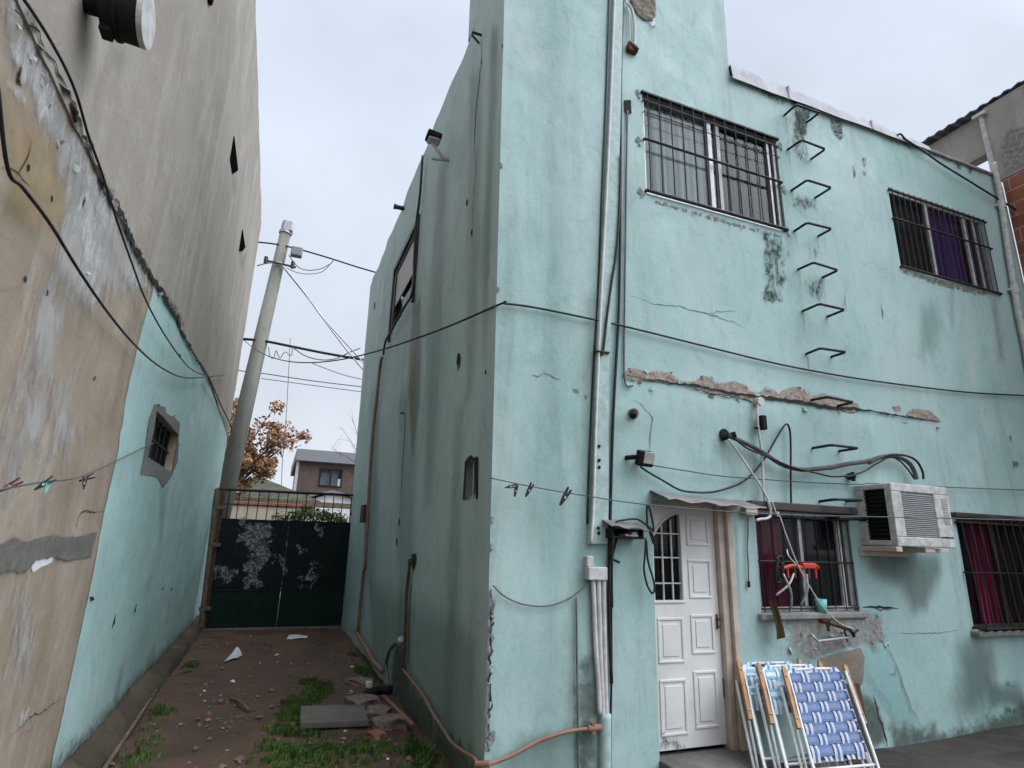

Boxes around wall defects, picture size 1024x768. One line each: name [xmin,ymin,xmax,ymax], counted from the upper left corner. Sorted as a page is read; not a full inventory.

peeling [9,0,147,308]
leakage [756,87,810,159]
leakage [764,232,784,302]
crack [630,295,737,324]
flaking render [625,368,942,429]
peeling [32,557,54,572]
spalling [484,590,496,752]